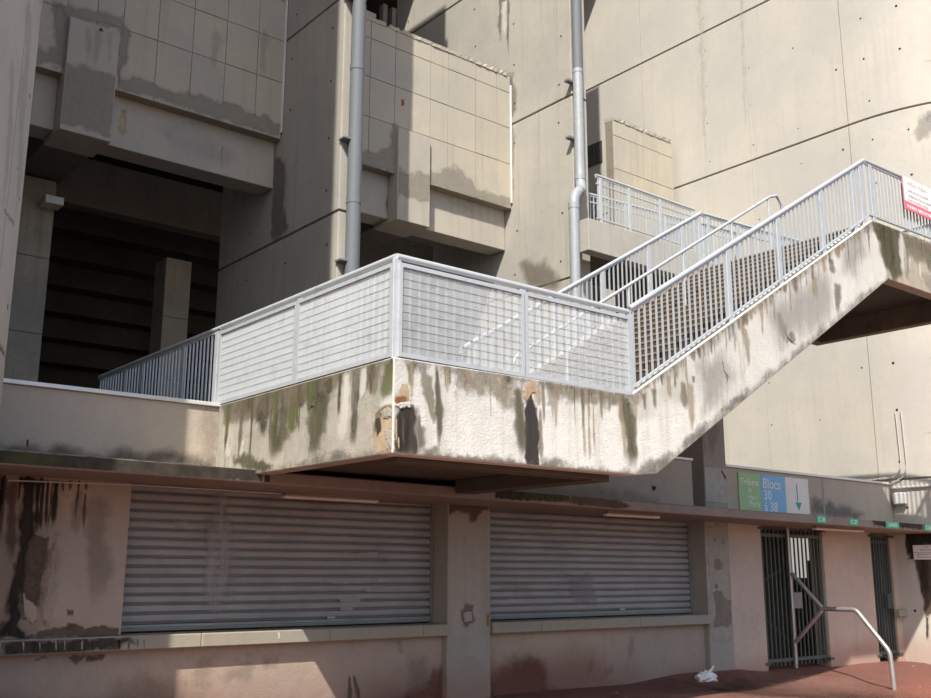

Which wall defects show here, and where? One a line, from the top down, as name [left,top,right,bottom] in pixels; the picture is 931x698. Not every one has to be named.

damp [823,222,931,279]
spalling [373,383,421,454]
damp [403,361,639,469]
damp [639,425,705,474]
damp [0,476,138,663]
damp [906,533,931,637]